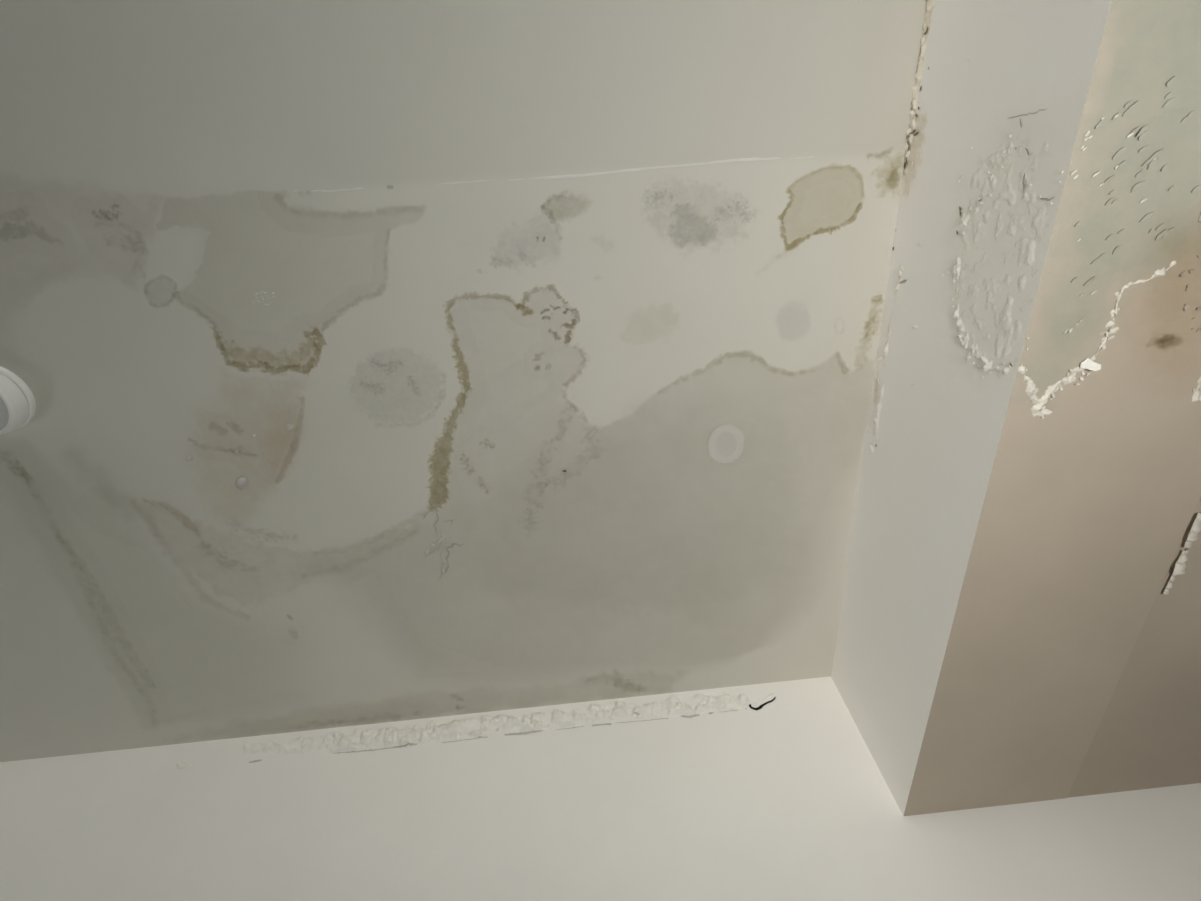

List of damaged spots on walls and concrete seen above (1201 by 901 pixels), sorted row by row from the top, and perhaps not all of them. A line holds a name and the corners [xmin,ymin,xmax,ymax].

peeling [899,0,934,203]
peeling [1163,513,1201,595]